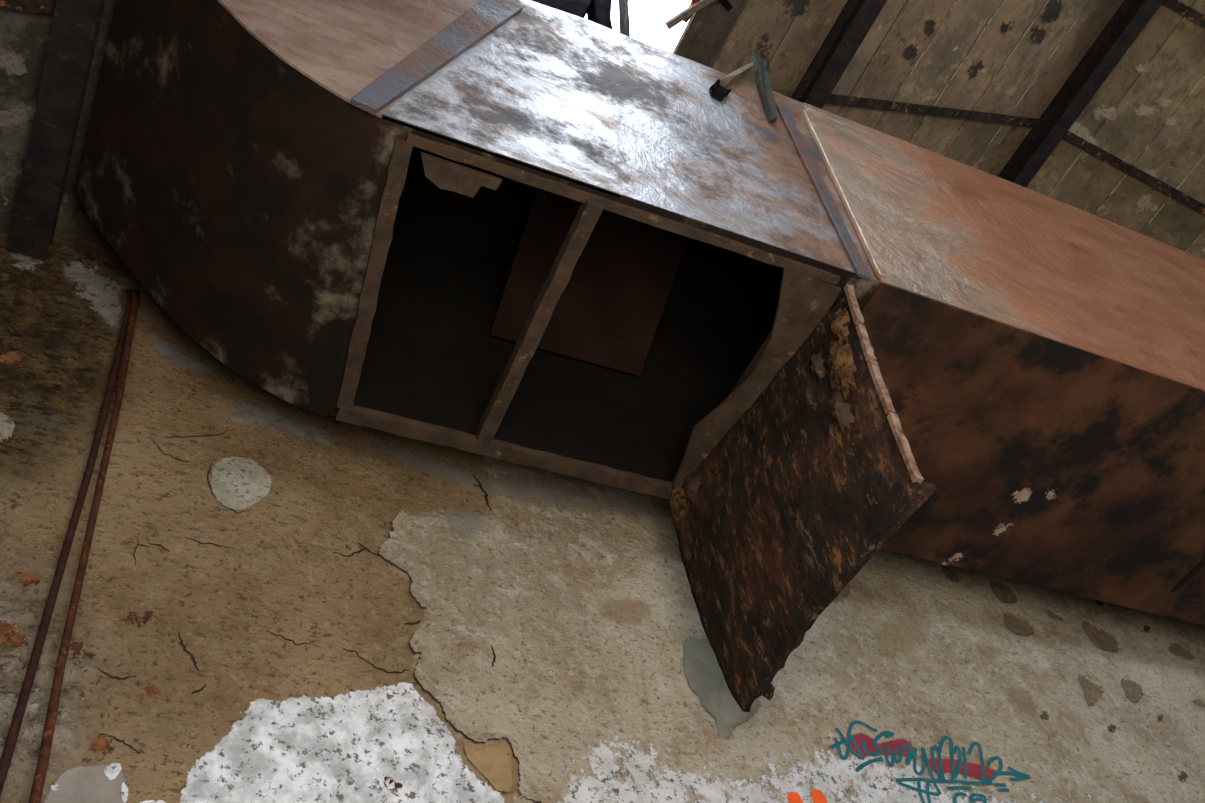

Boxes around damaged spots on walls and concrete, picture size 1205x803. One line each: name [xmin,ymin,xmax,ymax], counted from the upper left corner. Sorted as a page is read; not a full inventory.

water stain [783,0,811,18]
mould [1028,0,1066,45]
mould [902,19,937,66]
mould [967,60,984,80]
corrosion [811,308,857,435]
crack [333,542,381,557]
corrosion [69,642,101,660]
crack [344,648,410,673]
flaking render [683,636,761,738]
corrosion [89,734,120,758]
peeling [558,720,1072,803]